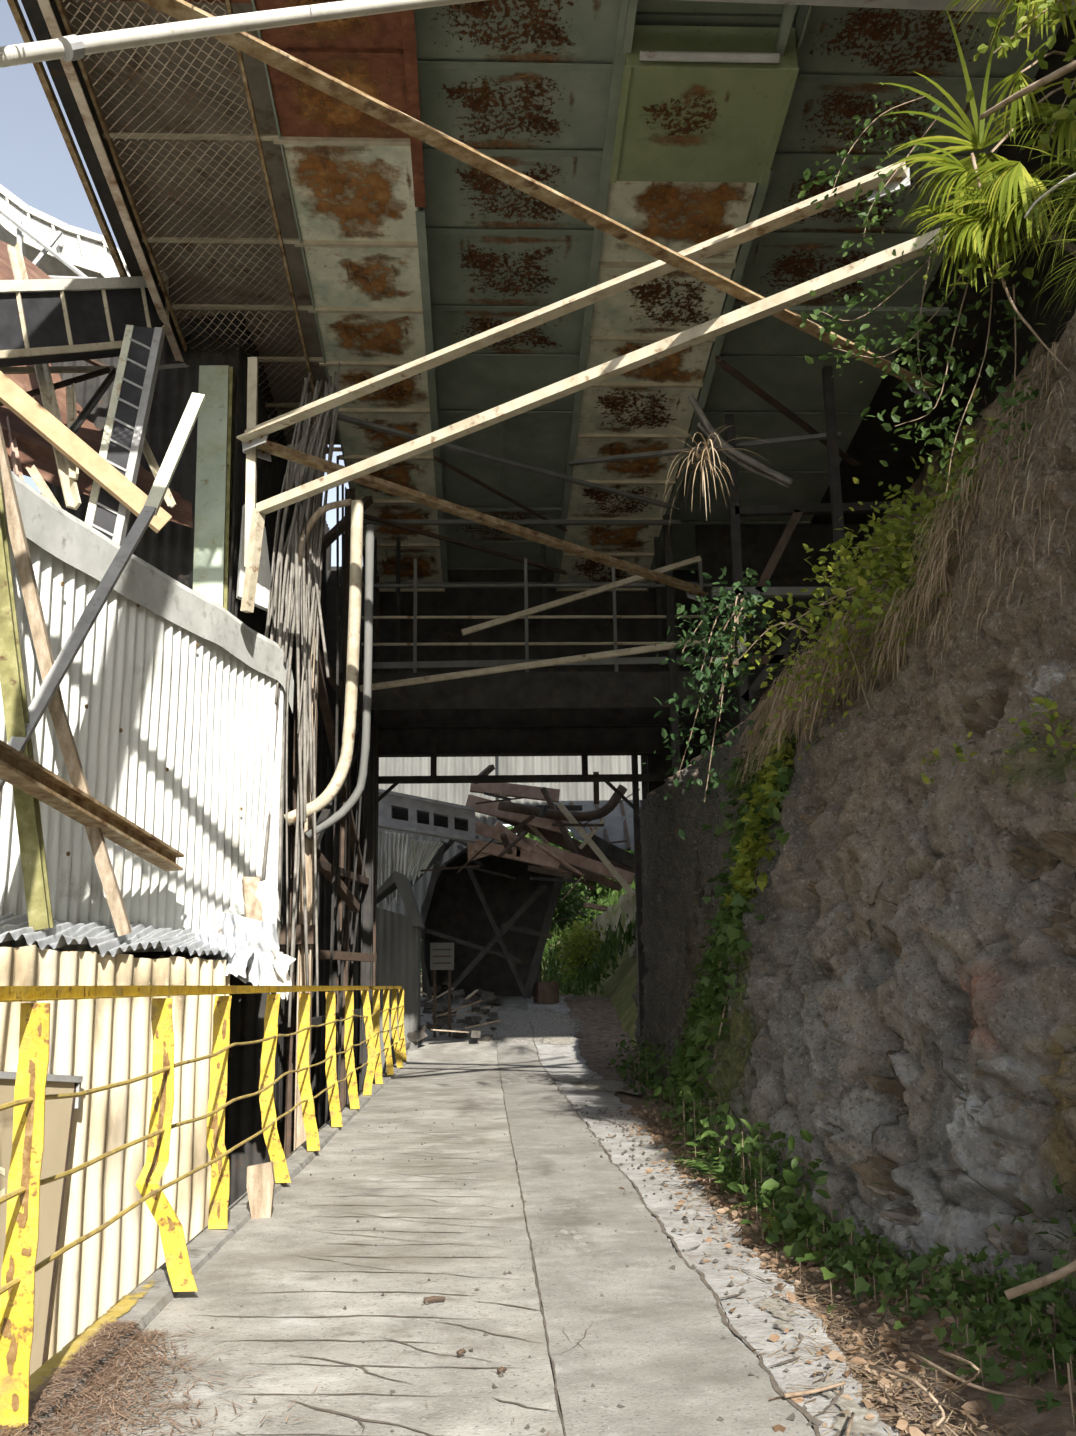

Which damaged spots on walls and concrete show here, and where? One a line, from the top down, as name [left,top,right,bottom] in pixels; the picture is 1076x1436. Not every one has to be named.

rust [294,16,368,40]
rust [309,58,391,99]
rust [293,82,411,238]
rust [433,0,584,354]
rust [642,85,729,146]
rust [755,8,1011,294]
rust [635,181,746,257]
rust [341,254,408,300]
rust [800,279,870,305]
rust [331,314,437,581]
rust [573,271,712,582]